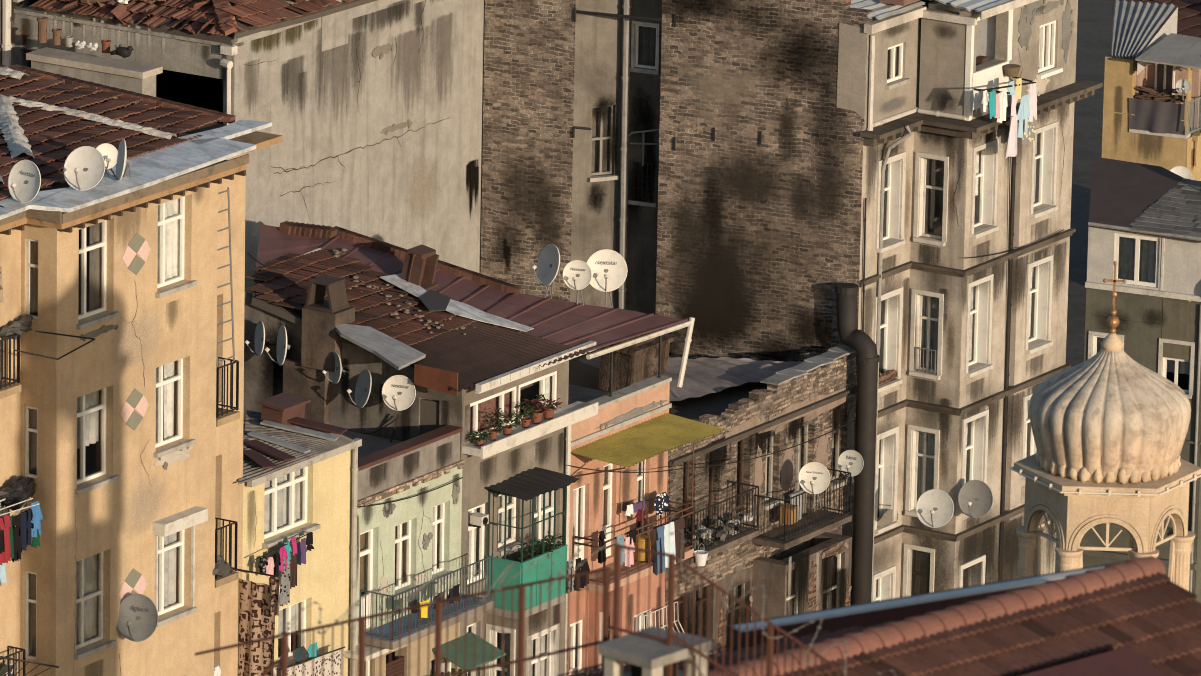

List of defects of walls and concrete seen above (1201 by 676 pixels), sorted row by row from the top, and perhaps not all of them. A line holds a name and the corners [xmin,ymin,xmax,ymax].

water stain [286,20,315,42]
water stain [353,0,422,30]
crack [271,118,449,216]
water stain [466,164,479,216]
water stain [589,185,604,208]
water stain [869,145,898,186]
water stain [922,126,1009,178]
water stain [667,160,777,353]
water stain [963,245,1063,301]
water stain [904,279,917,342]
water stain [760,314,828,362]
water stain [915,378,998,471]